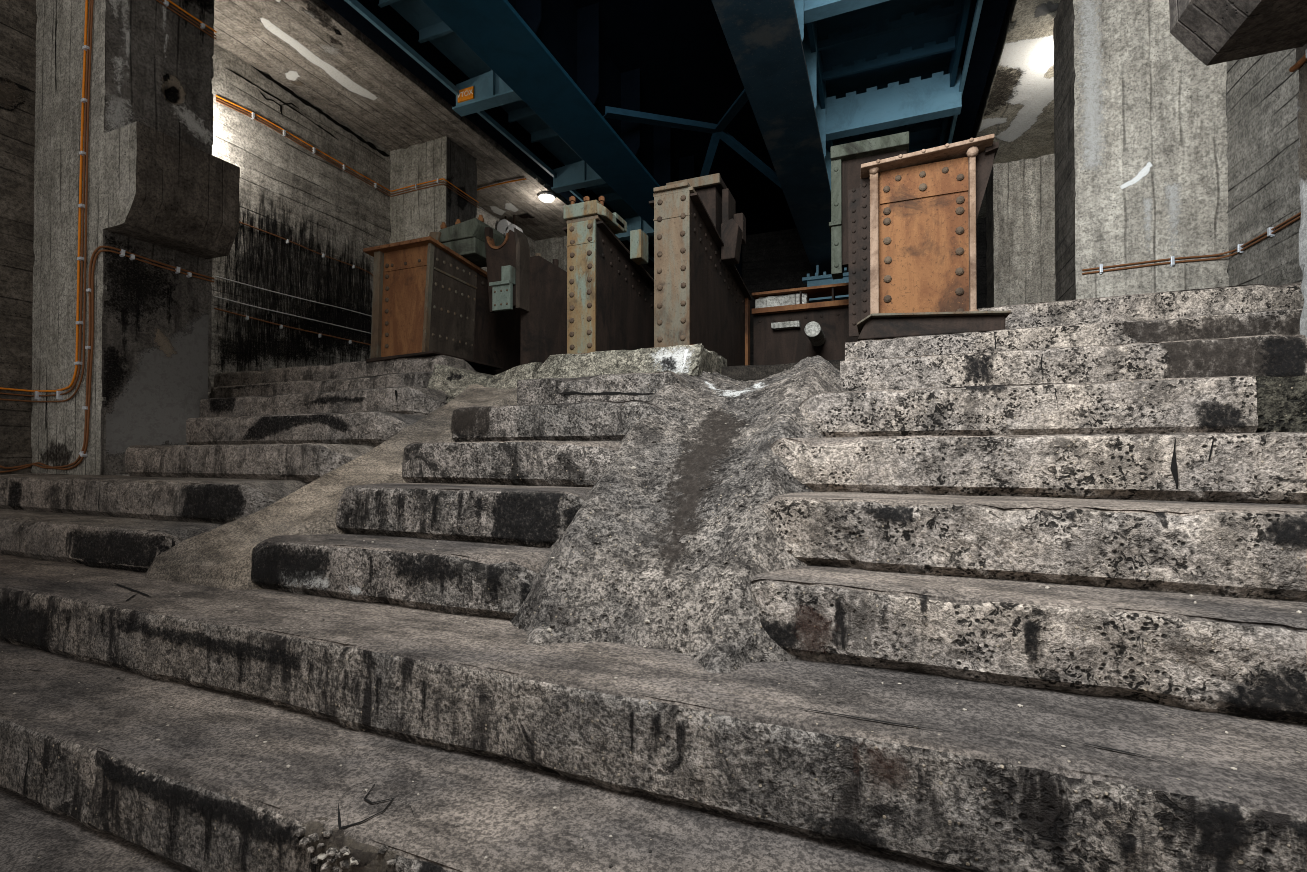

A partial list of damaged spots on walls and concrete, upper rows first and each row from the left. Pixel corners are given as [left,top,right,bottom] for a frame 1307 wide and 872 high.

spalling [1297,61,1307,182]
leakage [103,231,179,410]
leakage [208,196,373,414]
leakage [0,598,71,654]
leakage [100,612,313,693]
leakage [102,760,322,872]
crack [338,782,415,829]
leakage [419,860,446,872]